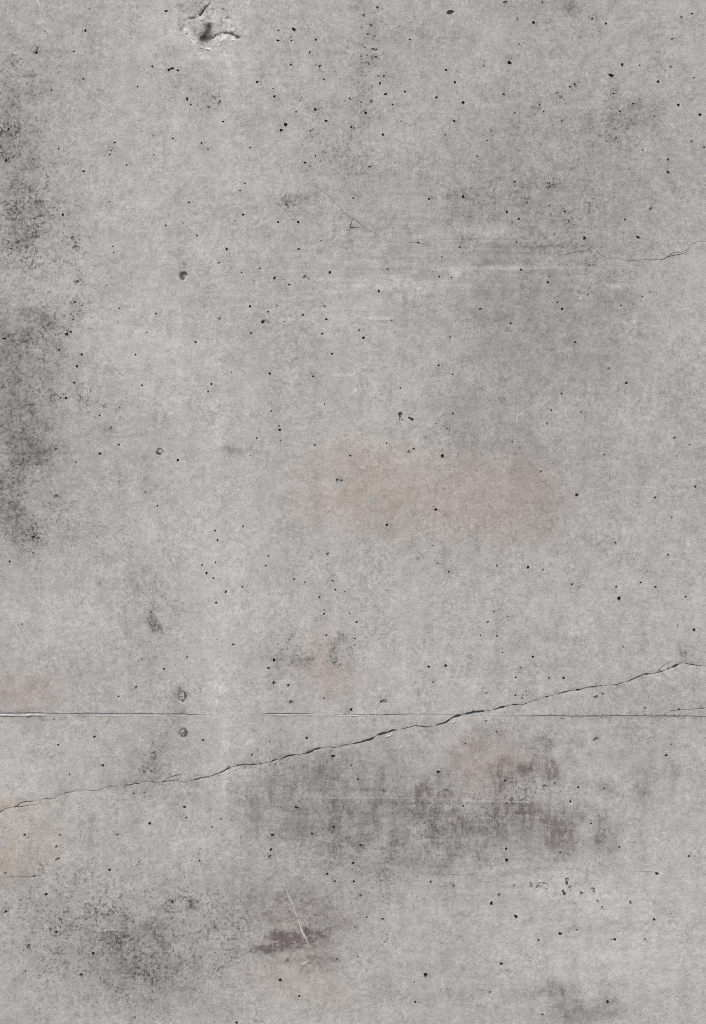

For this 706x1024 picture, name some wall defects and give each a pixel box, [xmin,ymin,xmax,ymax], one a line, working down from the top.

spalling [175,0,242,54]
crack [0,661,701,813]